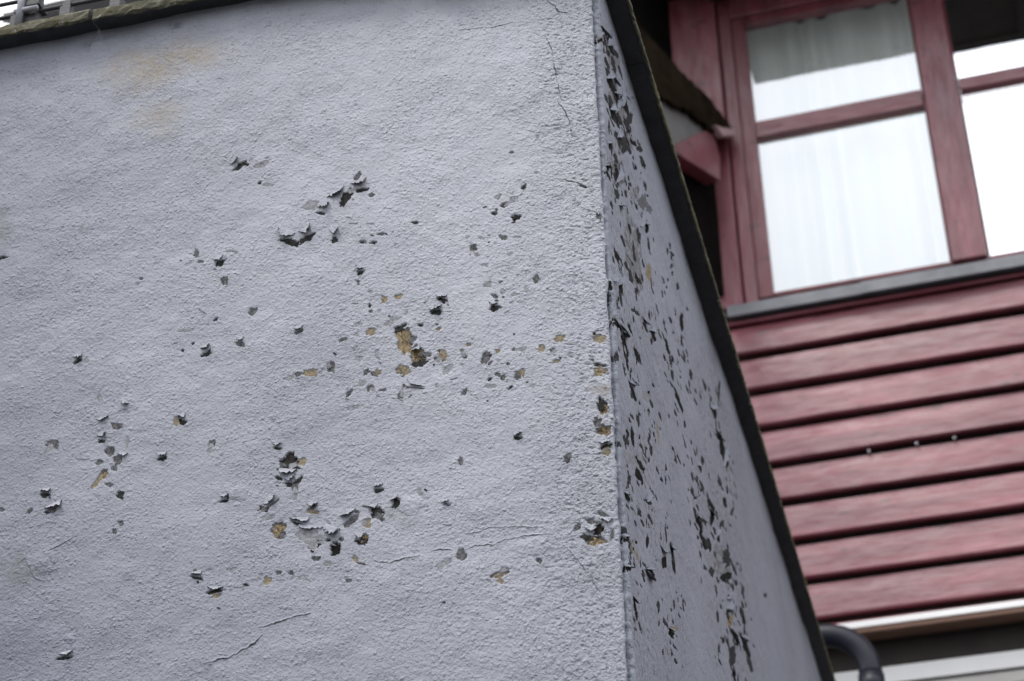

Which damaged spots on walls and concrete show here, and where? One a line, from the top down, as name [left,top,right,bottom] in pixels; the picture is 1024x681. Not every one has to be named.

crack [544,35,573,135]
peeling [277,172,397,247]
flaking render [284,263,473,411]
peeling [481,25,754,681]
peeling [45,441,59,454]
peeling [76,399,130,500]
peeling [27,487,62,515]
peeling [257,441,400,567]
crack [203,611,311,664]